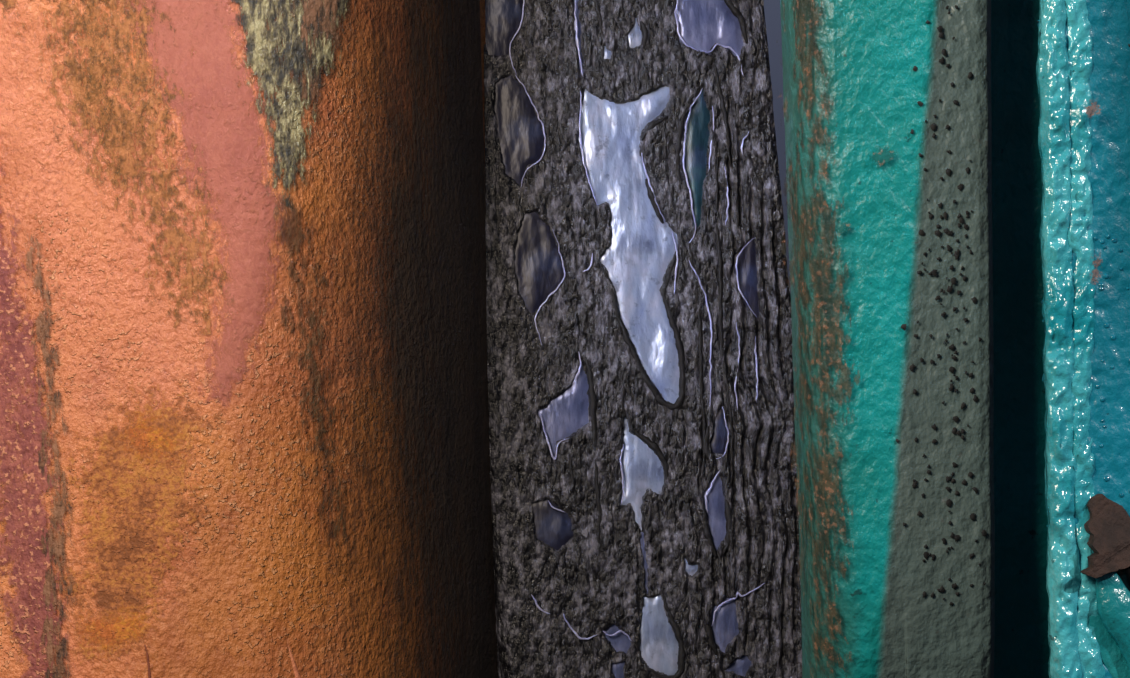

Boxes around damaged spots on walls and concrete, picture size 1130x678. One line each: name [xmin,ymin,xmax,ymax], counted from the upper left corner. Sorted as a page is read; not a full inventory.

peeling [485,0,546,188]
peeling [674,0,748,76]
peeling [574,0,710,410]
peeling [514,212,566,345]
peeling [733,236,759,318]
corrosion [781,0,860,678]
peeling [538,352,598,460]
peeling [602,417,686,678]
peeling [684,558,698,576]
peeling [702,407,733,558]
peeling [704,583,765,677]